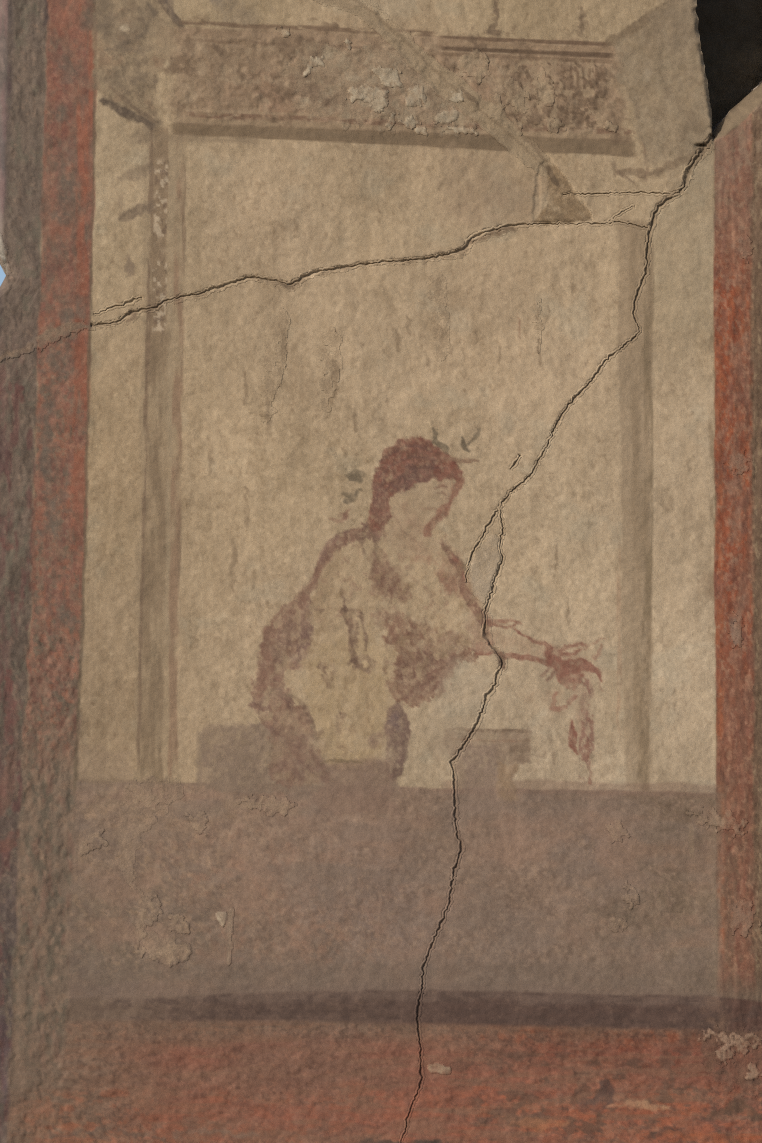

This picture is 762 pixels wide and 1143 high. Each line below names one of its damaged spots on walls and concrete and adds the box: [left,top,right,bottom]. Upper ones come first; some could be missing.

peeling [274,26,479,138]
crack [0,204,650,362]
crack [399,132,715,1143]
peeling [695,1024,762,1099]